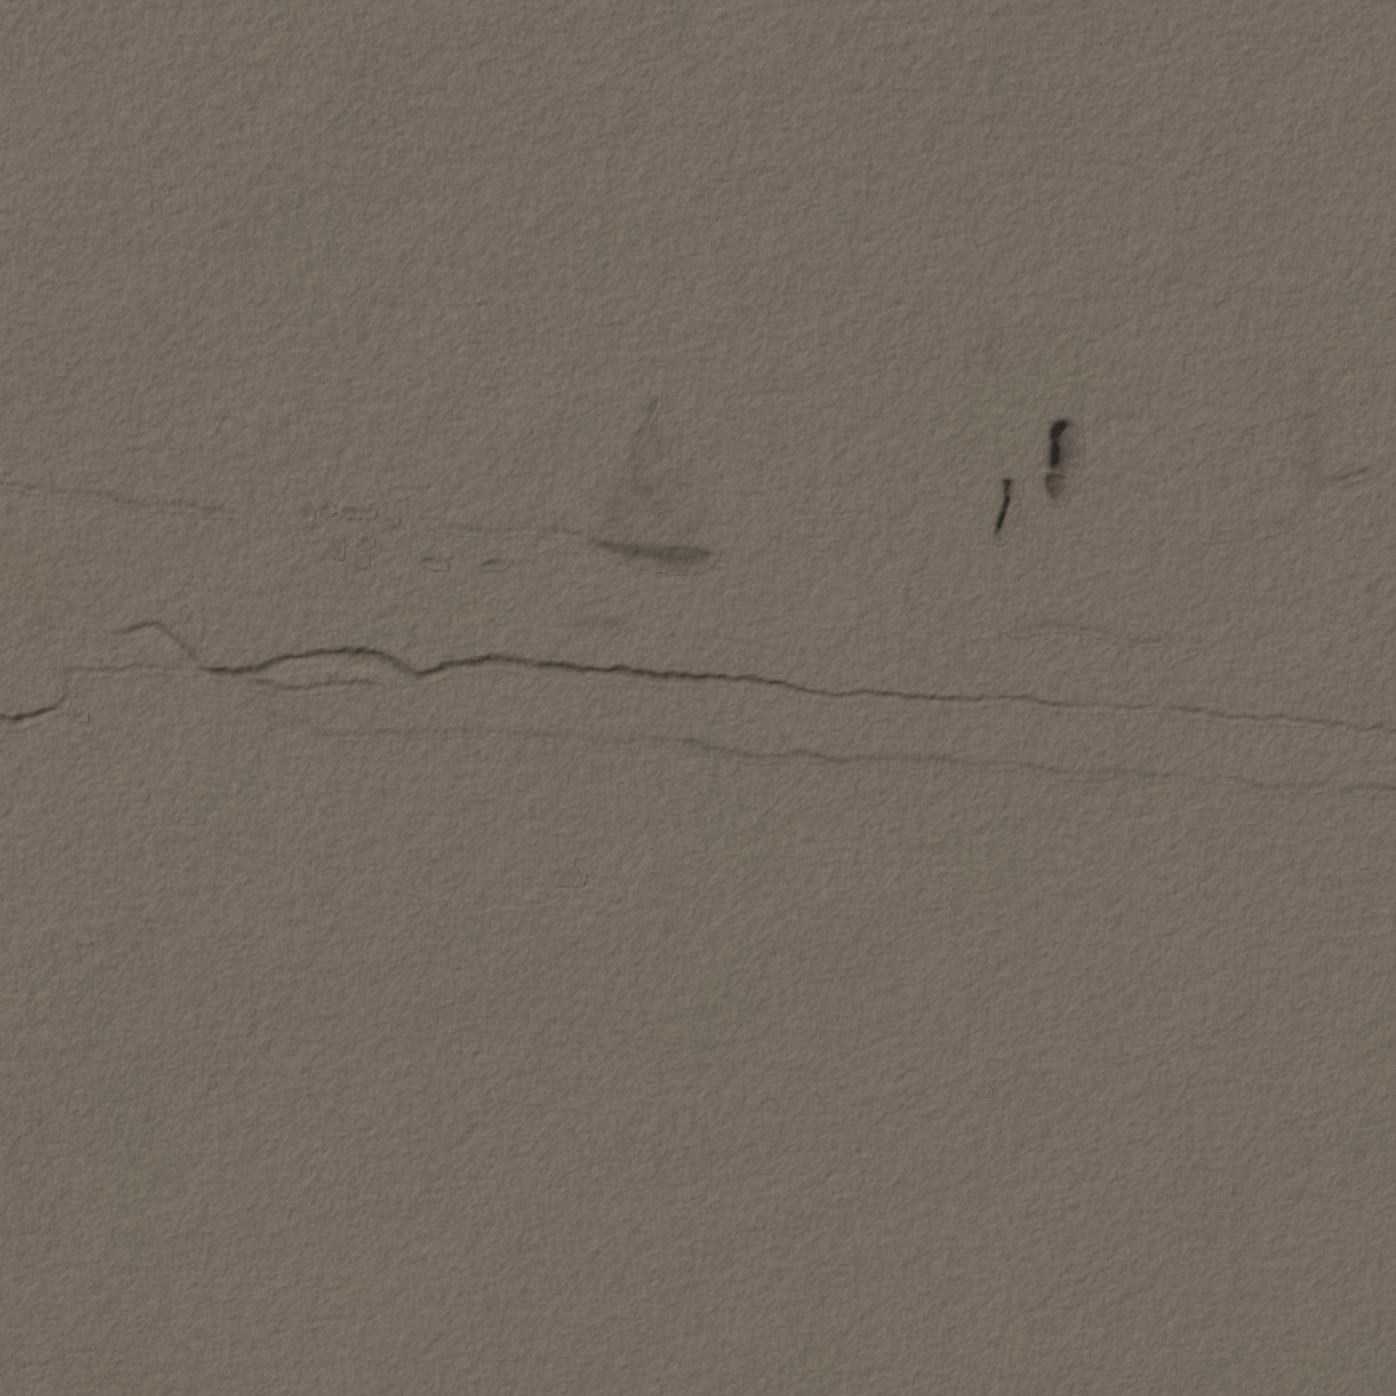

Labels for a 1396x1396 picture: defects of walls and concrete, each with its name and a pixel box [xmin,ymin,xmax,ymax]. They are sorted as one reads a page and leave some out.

crack [0,617,1396,741]